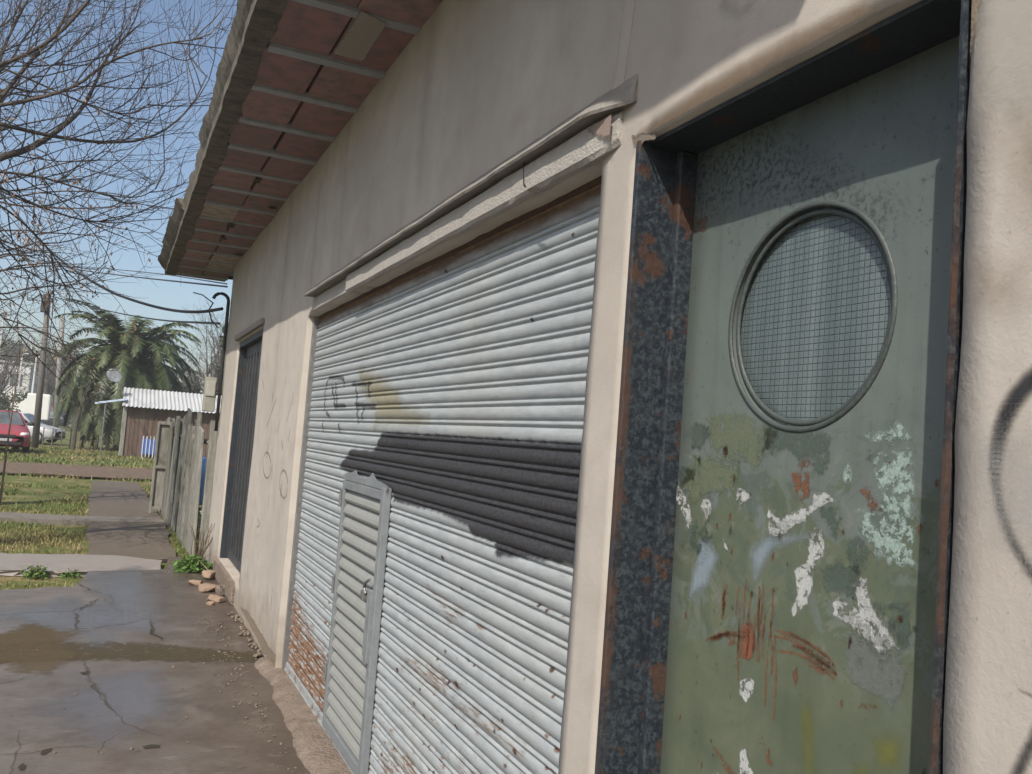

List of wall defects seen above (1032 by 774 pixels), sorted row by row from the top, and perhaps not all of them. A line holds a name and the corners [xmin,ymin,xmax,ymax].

peeling [676,413,830,553]
damp [0,569,170,673]
crack [16,583,164,642]
rust [287,581,328,712]
peeling [740,678,754,702]
rust [707,586,837,720]
peeling [767,423,915,706]
peeling [740,749,753,774]